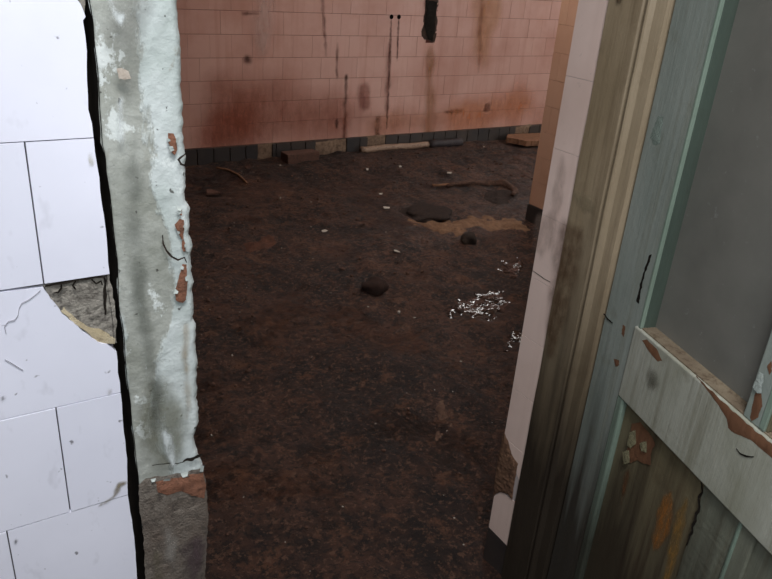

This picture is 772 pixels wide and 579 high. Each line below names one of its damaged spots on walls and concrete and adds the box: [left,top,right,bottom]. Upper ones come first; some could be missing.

damp [375,21,399,135]
peeling [167,133,179,155]
peeling [175,206,189,254]
spalling [43,274,117,344]
crack [83,0,202,579]
peeling [174,264,189,303]
peeling [696,362,772,457]
flaking render [138,466,209,579]
crack [686,482,703,545]